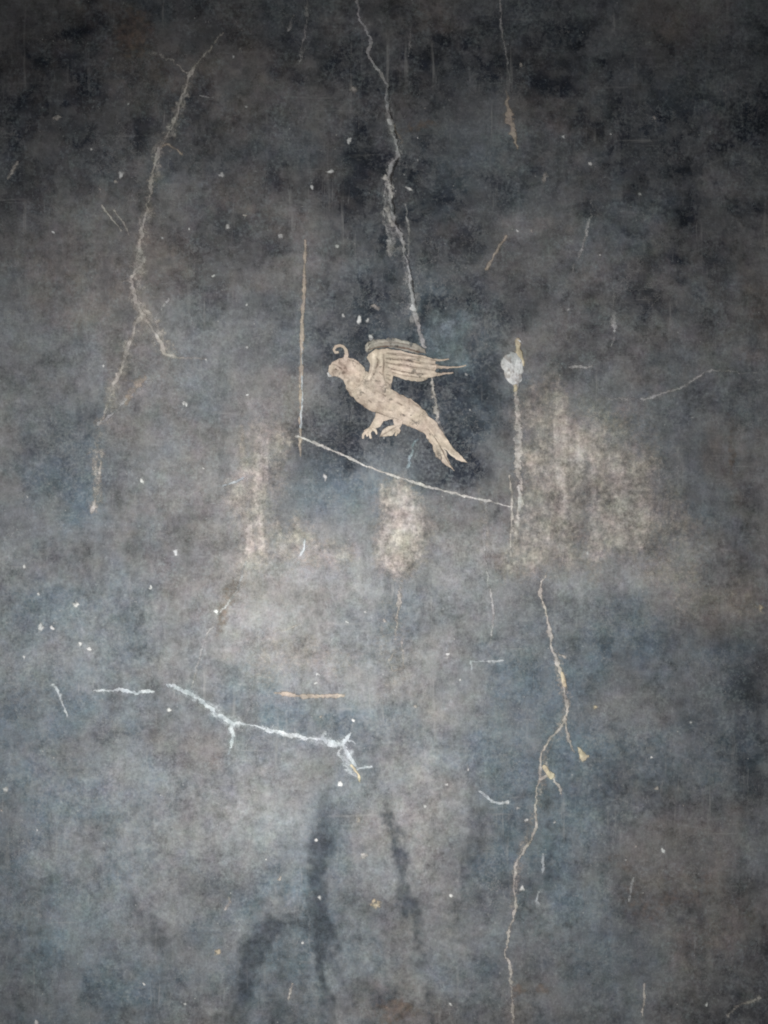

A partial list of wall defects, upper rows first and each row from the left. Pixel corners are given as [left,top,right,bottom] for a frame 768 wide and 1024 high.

crack [90,33,224,513]
crack [355,0,426,348]
crack [430,378,443,431]
crack [94,561,373,782]
crack [504,546,589,1023]
damp [237,919,284,1005]
damp [305,825,339,987]